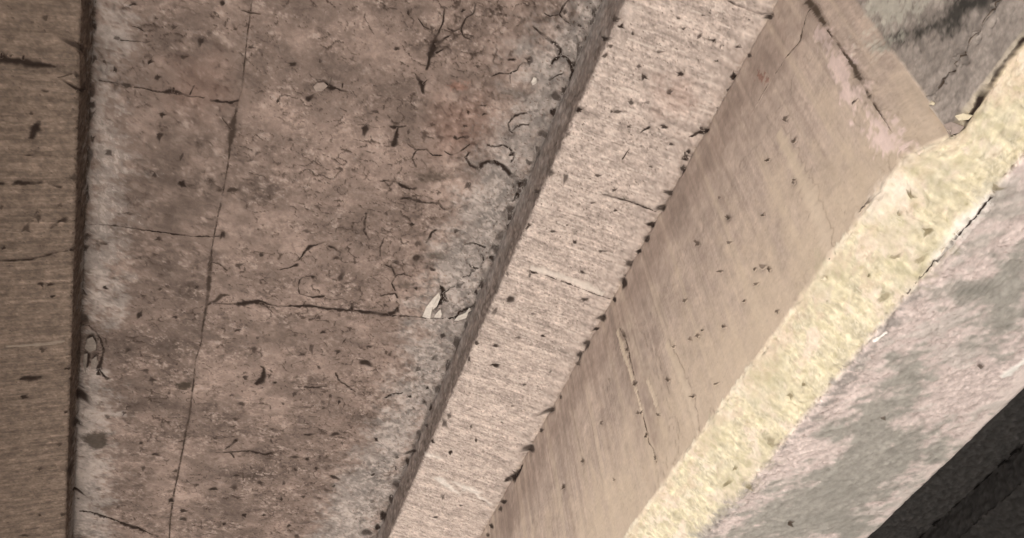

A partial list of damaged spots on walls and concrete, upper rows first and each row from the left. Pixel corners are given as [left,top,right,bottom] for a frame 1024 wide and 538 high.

crack [491,62,523,84]
crack [531,0,575,83]
crack [749,0,893,133]
crack [379,109,539,244]
peeling [63,311,111,380]
crack [0,0,486,538]
peeling [422,293,442,319]
crack [620,328,657,463]